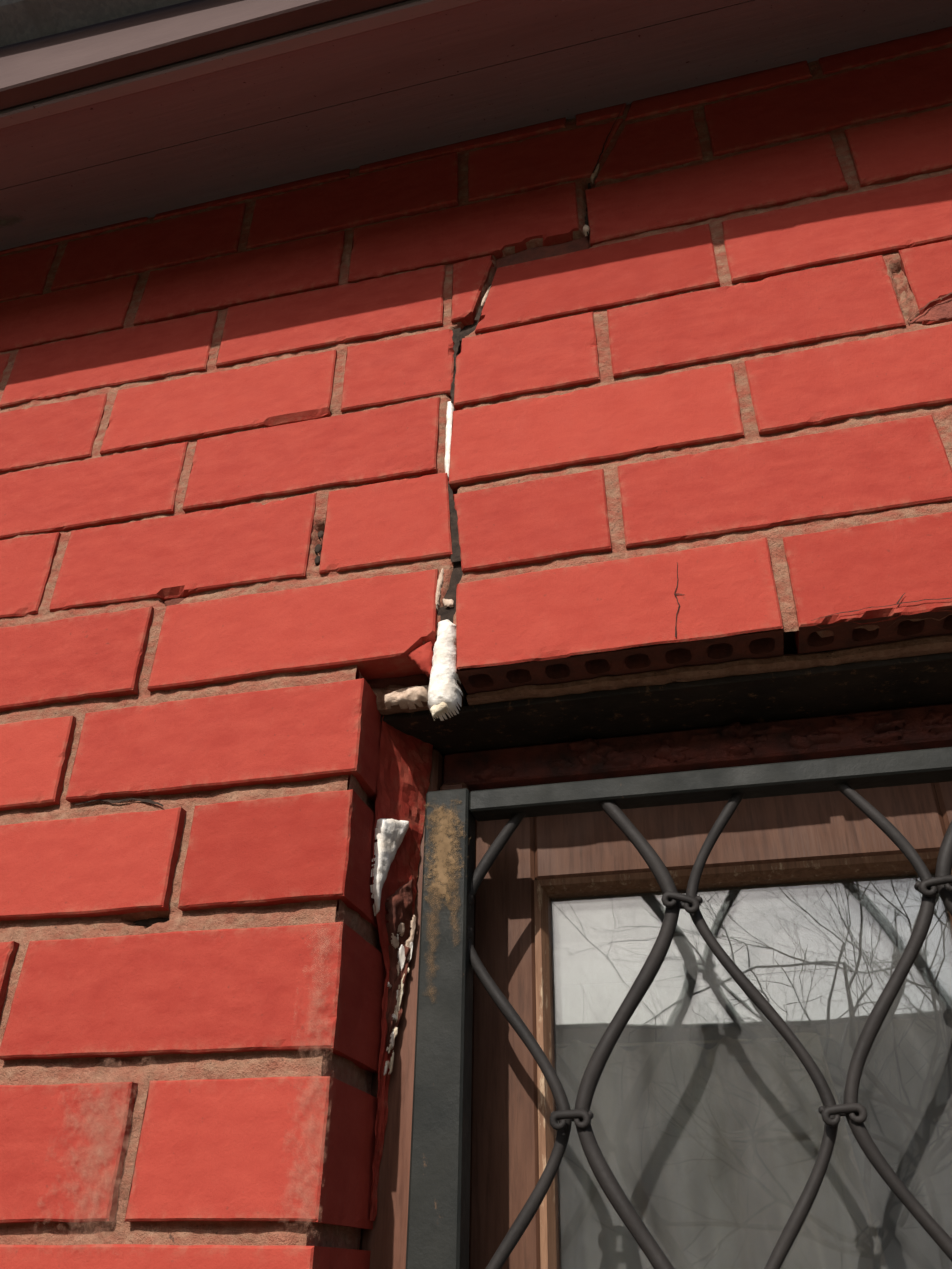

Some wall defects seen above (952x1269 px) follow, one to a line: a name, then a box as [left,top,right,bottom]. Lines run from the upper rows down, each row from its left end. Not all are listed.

crack [583,111,621,236]
crack [450,275,495,402]
spalling [908,292,952,325]
crack [435,481,463,638]
crack [674,563,685,637]
spalling [384,877,416,1076]